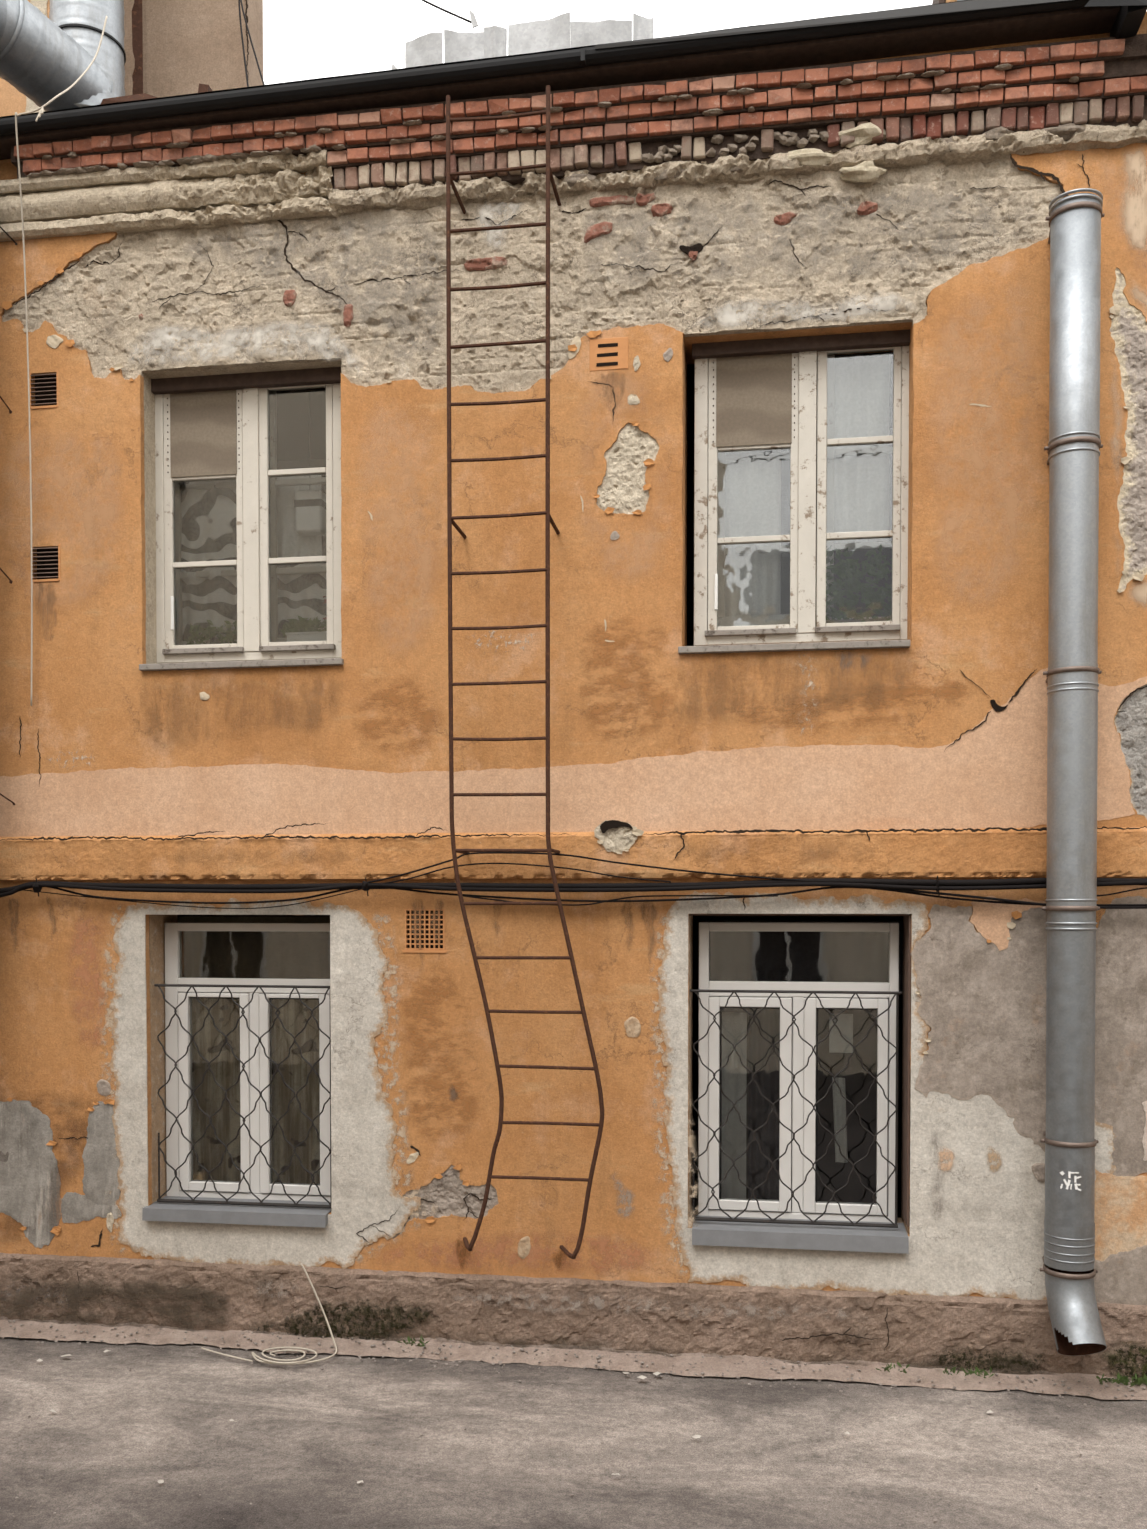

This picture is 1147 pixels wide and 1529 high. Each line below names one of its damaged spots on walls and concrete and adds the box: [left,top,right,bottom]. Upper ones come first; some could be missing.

peeling [1125,151,1147,247]
crack [12,244,121,306]
crack [153,204,460,309]
flaking render [1,158,1064,394]
flaking render [593,394,659,540]
peeling [1109,268,1147,603]
crack [945,669,1037,750]
flaking render [1114,684,1147,819]
flaking render [594,820,644,854]
peeling [970,896,1046,951]
flaking render [393,1164,498,1238]
peeling [1094,1169,1147,1261]